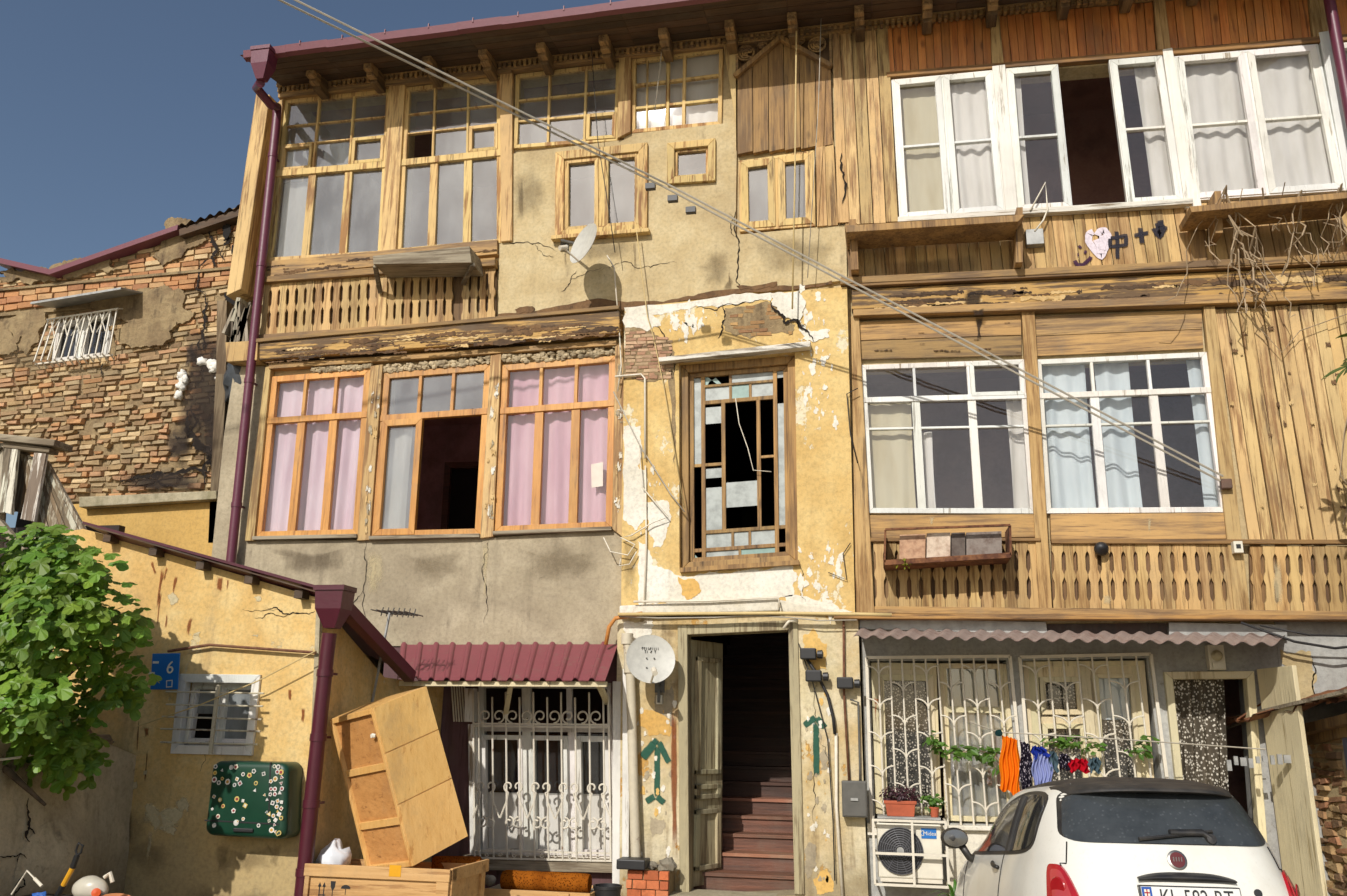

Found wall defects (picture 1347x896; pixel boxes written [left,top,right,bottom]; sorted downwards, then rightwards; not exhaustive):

crack [195,230,231,342]
spalling [222,224,234,255]
crack [509,242,674,291]
crack [699,212,814,341]
water stain [186,344,195,365]
peeling [266,280,839,462]
water stain [203,415,214,456]
peeling [614,409,853,641]
crack [243,607,313,618]
peeling [637,701,677,858]
spalling [803,629,834,895]